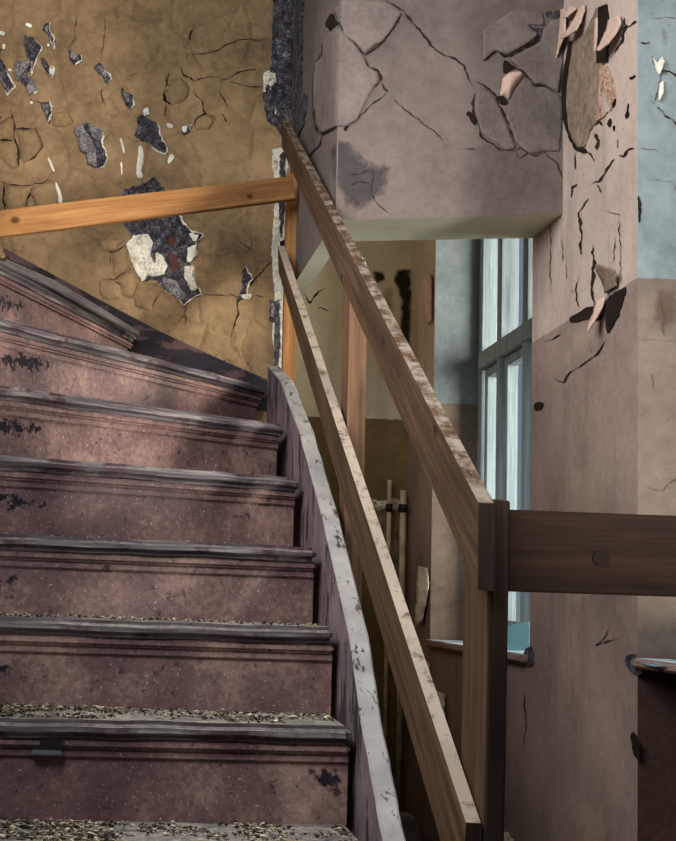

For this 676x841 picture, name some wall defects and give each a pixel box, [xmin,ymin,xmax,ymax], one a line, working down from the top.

flaking render [0,23,55,96]
crack [162,28,268,125]
flaking render [466,3,622,154]
crack [0,114,49,210]
flaking render [74,123,108,170]
flaking render [122,177,166,196]
flaking render [134,107,168,155]
crack [309,0,655,308]
flaking render [124,215,204,305]
crack [202,263,271,336]
crack [305,288,329,311]
crack [553,338,607,383]